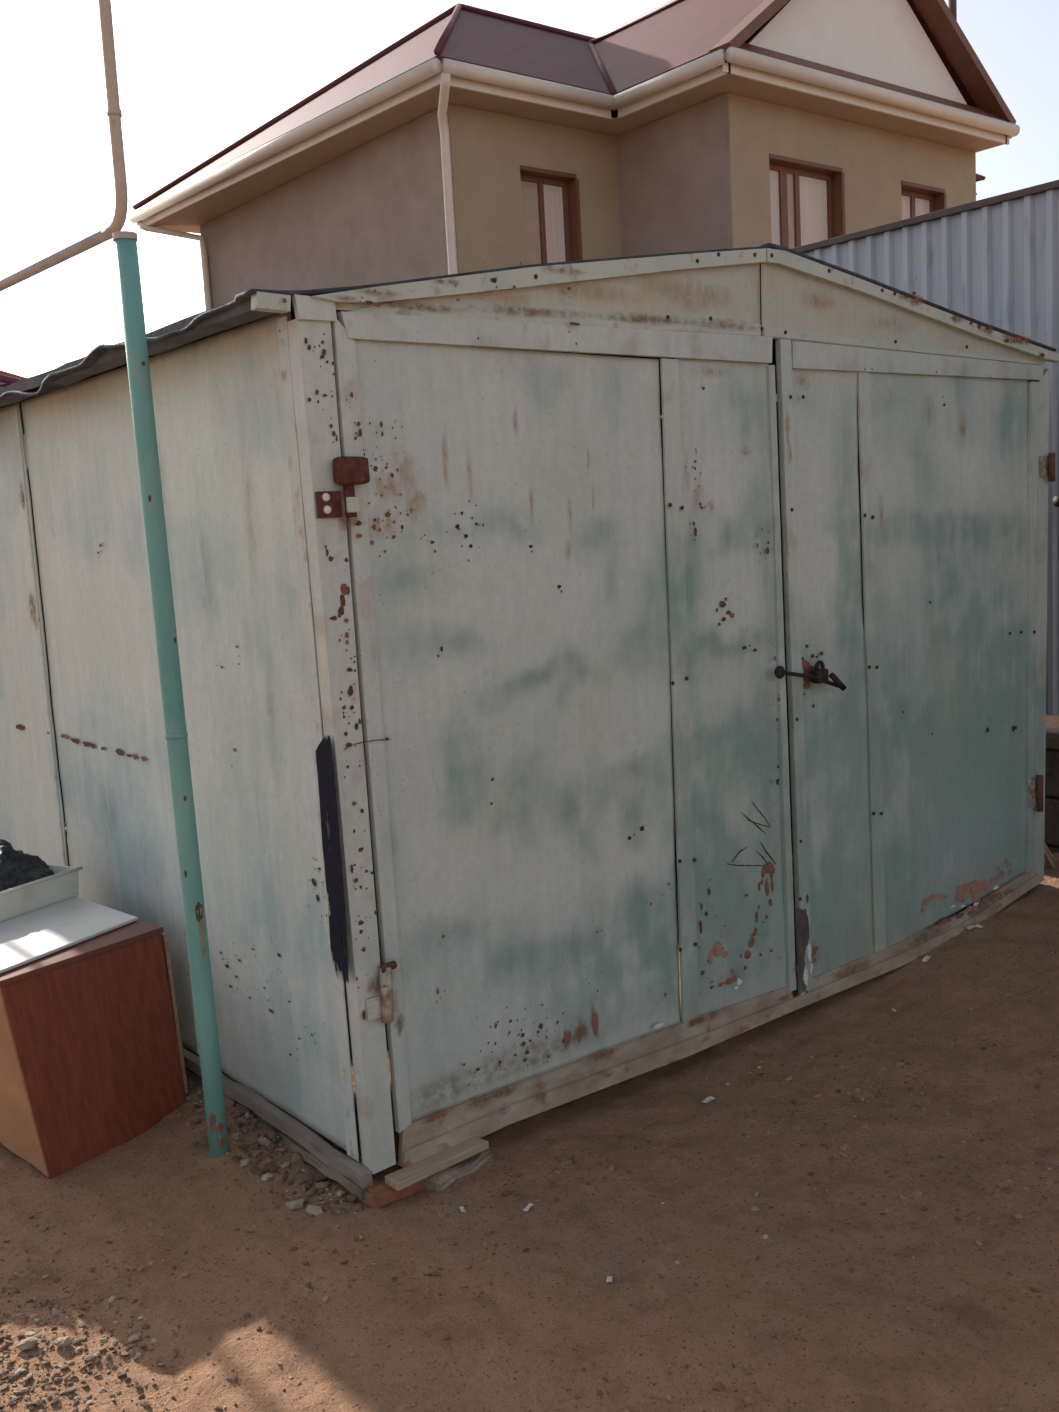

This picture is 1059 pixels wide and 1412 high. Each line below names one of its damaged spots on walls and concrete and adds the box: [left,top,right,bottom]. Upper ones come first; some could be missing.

corrosion [329,584,350,623]
corrosion [47,732,147,762]
corrosion [745,862,775,907]
peeling [699,887,780,994]
peeling [796,894,813,995]
corrosion [564,1012,598,1044]